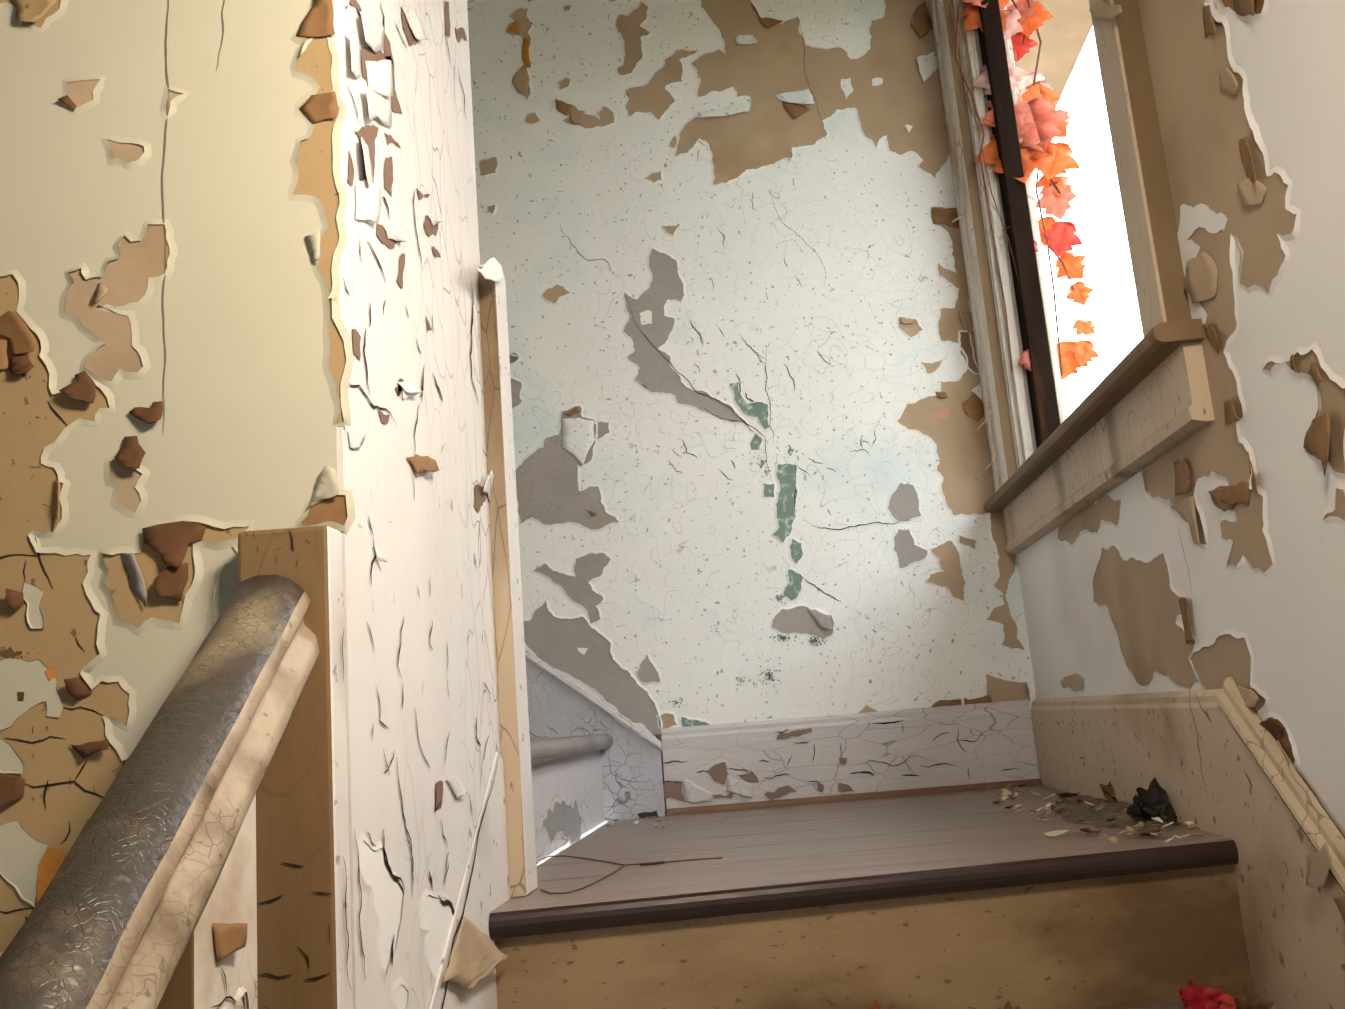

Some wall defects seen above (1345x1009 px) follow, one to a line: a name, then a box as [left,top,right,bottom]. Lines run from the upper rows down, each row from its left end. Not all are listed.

crack [216,0,225,71]
peeling [504,0,950,187]
crack [161,0,169,434]
peeling [288,0,444,426]
peeling [1138,0,1301,578]
crack [48,402,67,425]
peeling [885,205,1027,652]
crack [0,537,53,589]
peeling [0,219,256,962]
peeling [523,550,714,742]
crack [5,707,123,845]
crack [850,720,1105,779]